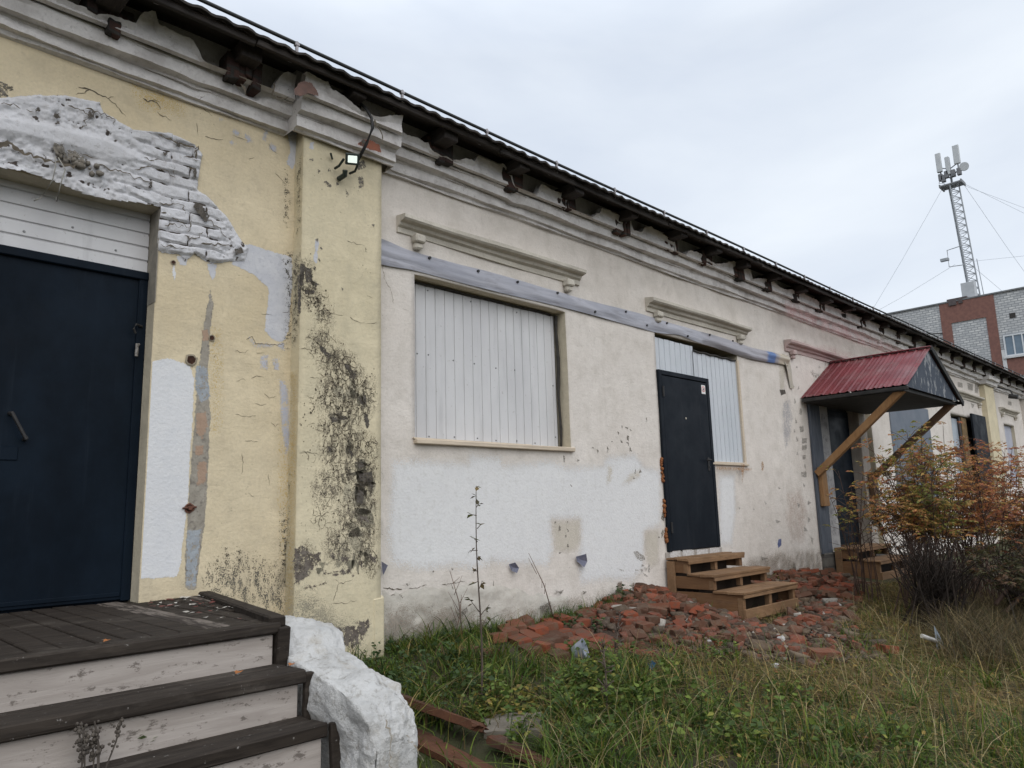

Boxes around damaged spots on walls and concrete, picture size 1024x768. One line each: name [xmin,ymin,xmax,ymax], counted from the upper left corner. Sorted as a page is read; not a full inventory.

spalling [0,82,293,454]
peeling [141,354,210,587]
damp [201,513,369,657]